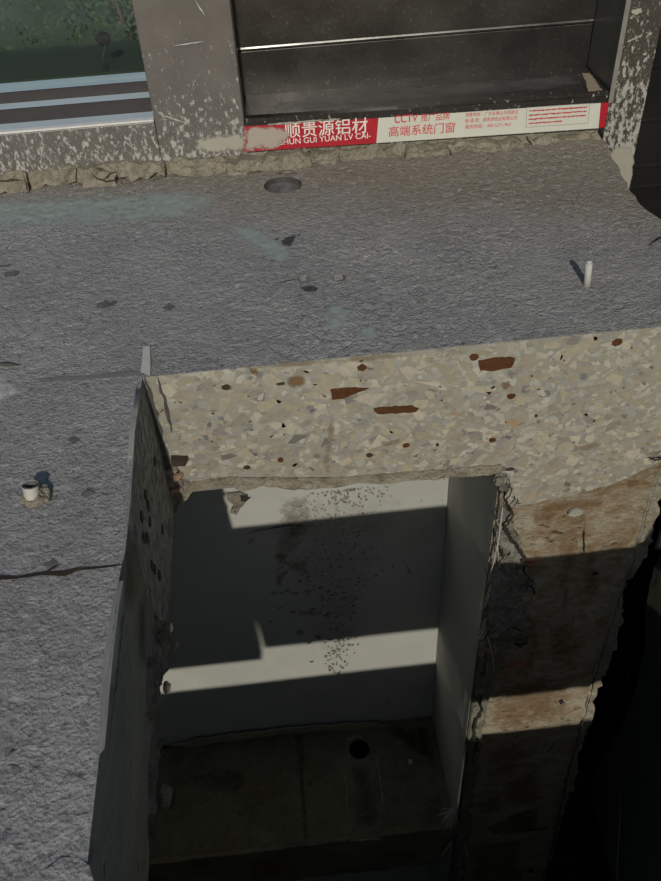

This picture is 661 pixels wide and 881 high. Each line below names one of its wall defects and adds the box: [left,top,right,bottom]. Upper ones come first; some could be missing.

spalling [149,328,661,635]
leakage [270,487,402,675]
spalling [146,621,179,817]
spalling [448,651,492,881]
crack [470,686,485,769]